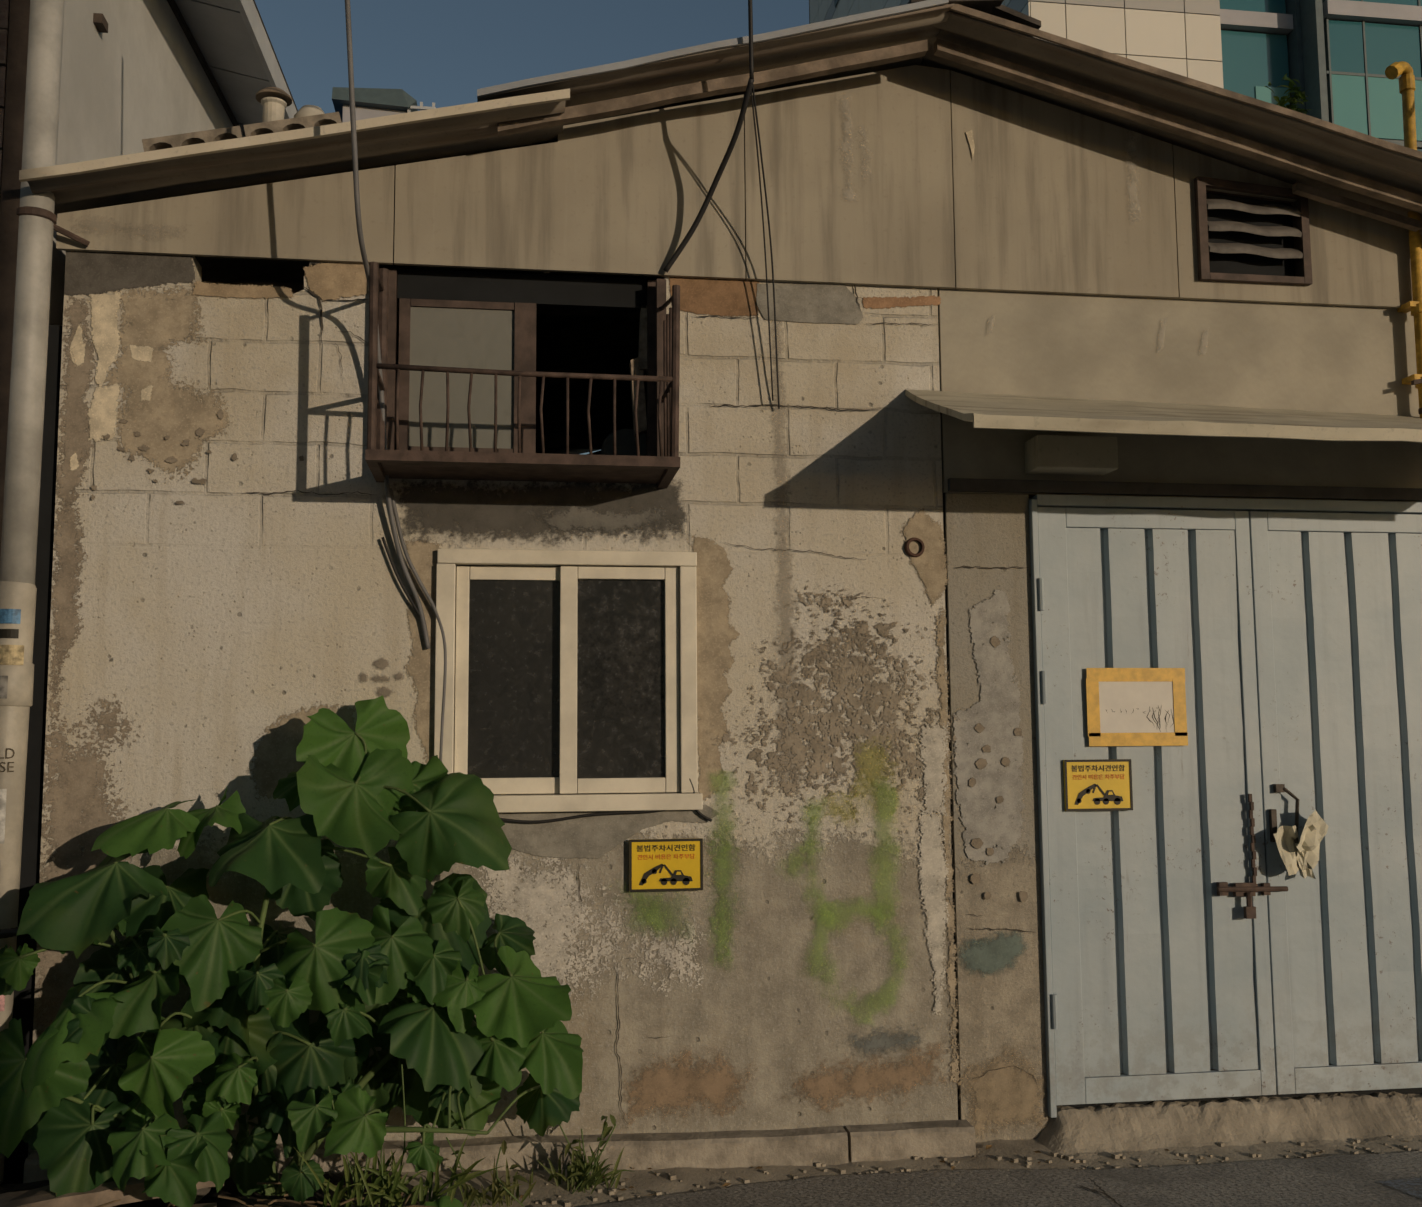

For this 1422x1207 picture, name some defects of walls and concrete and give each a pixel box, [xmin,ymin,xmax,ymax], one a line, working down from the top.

peeling [40,251,369,883]
damp [394,479,687,544]
peeling [708,569,1026,865]
peeling [33,929,126,1043]